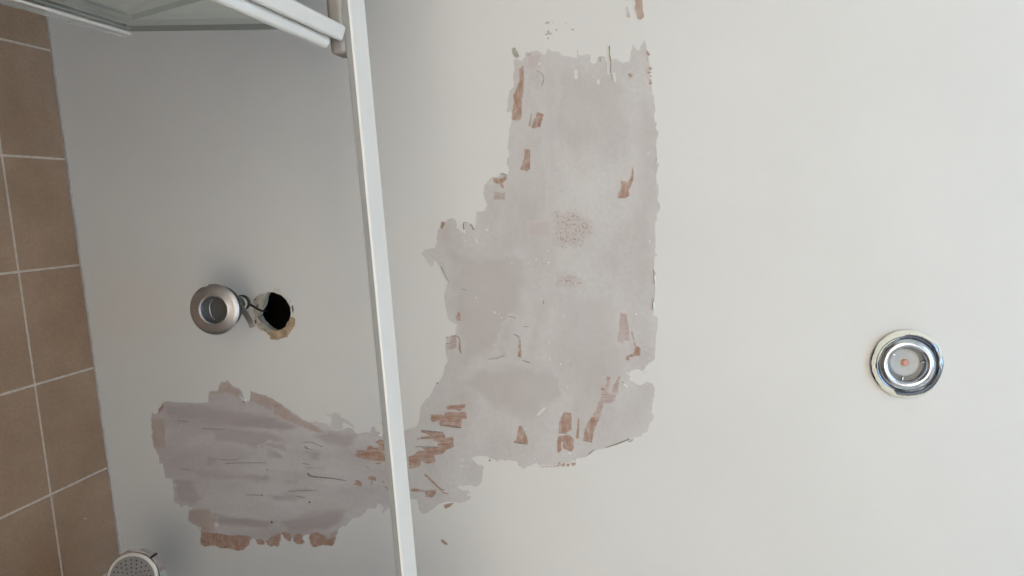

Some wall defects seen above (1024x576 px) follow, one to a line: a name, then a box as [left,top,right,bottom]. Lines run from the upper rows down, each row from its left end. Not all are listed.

peeling [151,380,390,551]
peeling [404,21,660,514]